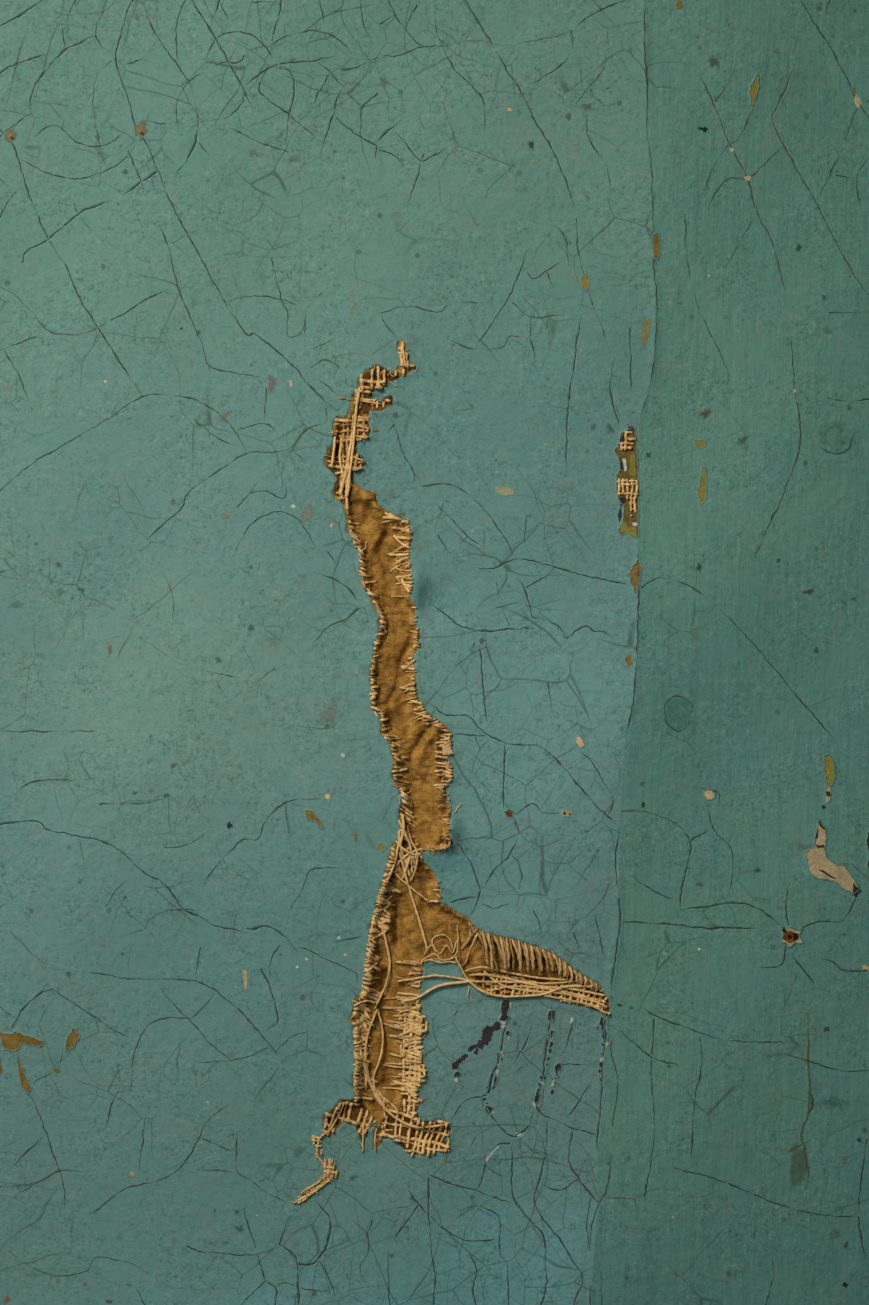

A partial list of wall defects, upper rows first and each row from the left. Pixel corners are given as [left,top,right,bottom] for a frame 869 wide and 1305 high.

crack [378,0,658,467]
crack [684,70,869,313]
peeling [613,426,640,539]
crack [237,484,361,647]
crack [389,424,869,991]
peeling [804,753,869,897]
crack [0,779,360,1121]
peeling [0,1030,46,1096]
peeling [64,1027,81,1053]
peeling [452,998,512,1116]
peeling [532,1004,583,1108]
crack [94,1006,867,1305]